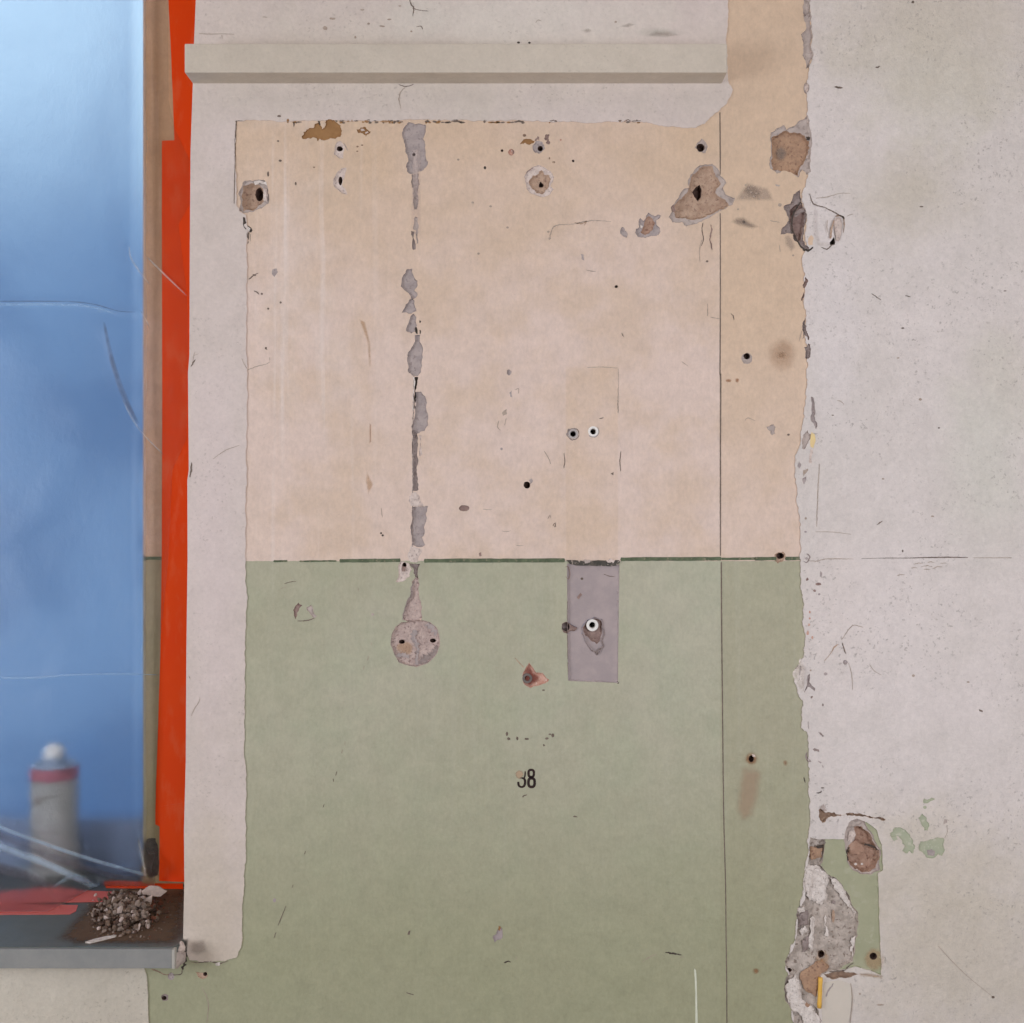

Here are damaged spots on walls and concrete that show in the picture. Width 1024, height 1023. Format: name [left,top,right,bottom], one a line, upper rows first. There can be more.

peeling [277,115,403,152]
peeling [483,120,562,156]
flaking render [524,157,555,197]
flaking render [620,164,735,238]
flaking render [769,115,814,252]
flaking render [784,798,948,1023]